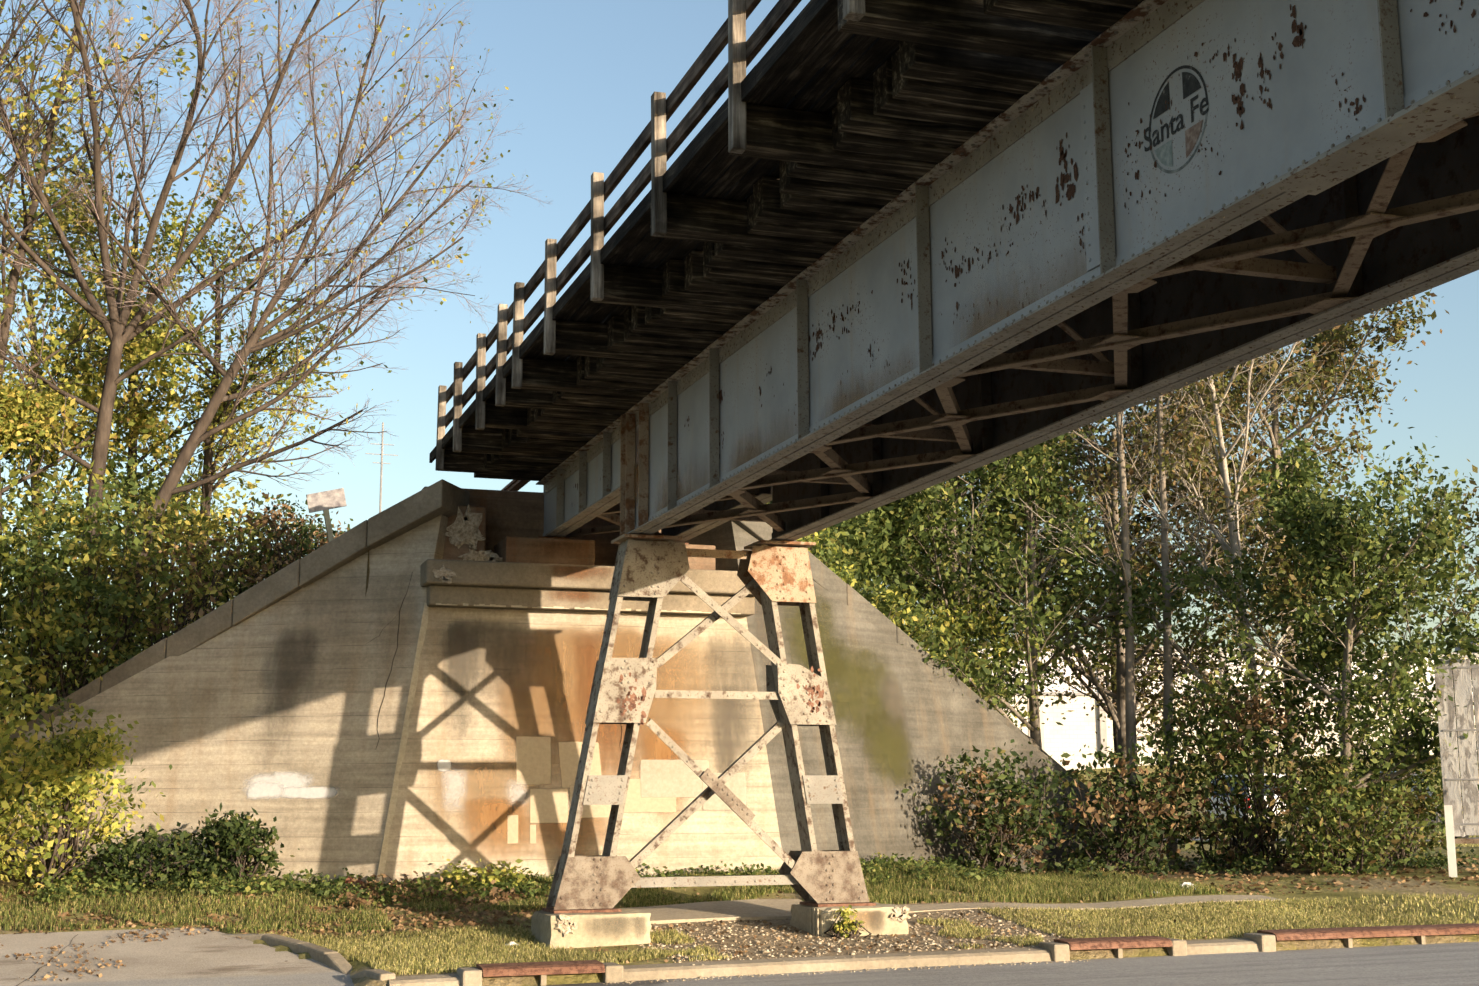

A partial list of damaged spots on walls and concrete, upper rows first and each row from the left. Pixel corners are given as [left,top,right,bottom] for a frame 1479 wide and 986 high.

crack [366,572,413,748]
corrosion [514,631,640,763]
corrosion [644,649,699,760]